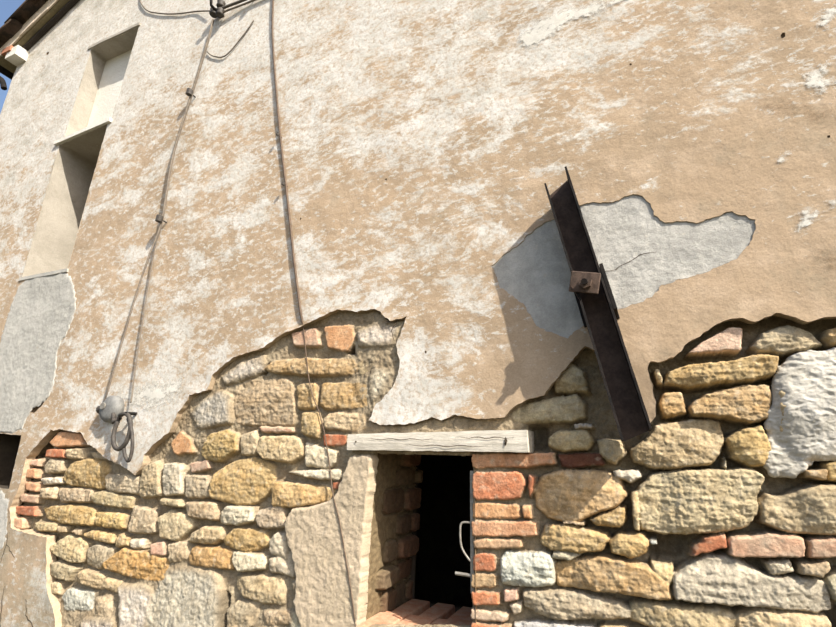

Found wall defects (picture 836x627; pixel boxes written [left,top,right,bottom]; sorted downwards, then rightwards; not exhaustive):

flaking render [492,219,584,338]
flaking render [579,194,756,310]
flaking render [9,309,836,627]